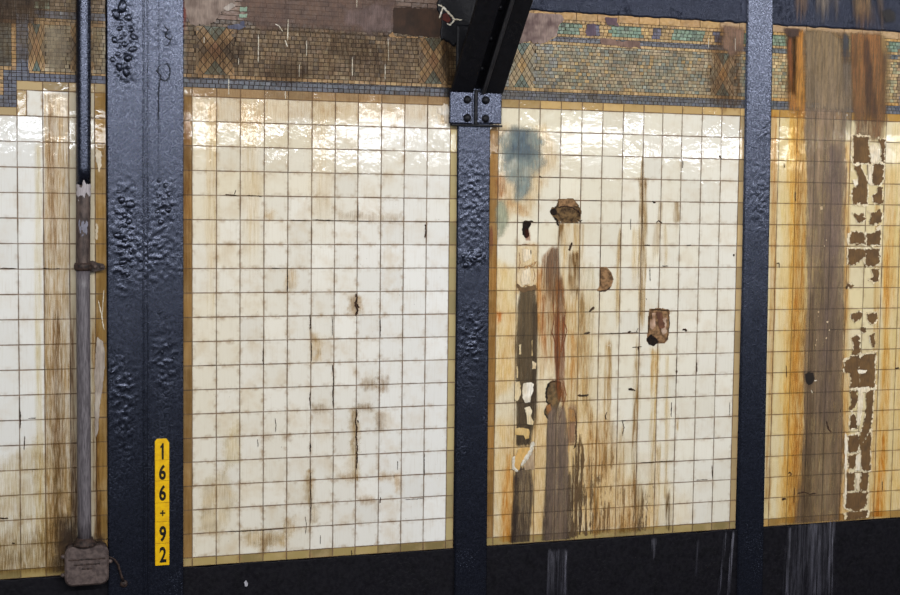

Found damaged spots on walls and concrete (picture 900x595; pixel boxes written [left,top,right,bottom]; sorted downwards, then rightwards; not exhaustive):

leakage [500,128,543,200]
rust [76,185,91,263]
leakage [497,202,508,234]
spalling [550,198,582,226]
peeling [846,133,886,284]
crack [353,294,361,316]
rust [544,248,567,408]
spalling [646,308,670,346]
leakage [787,31,890,548]
crack [353,409,361,468]
peeling [514,366,535,470]
peeling [843,311,879,520]